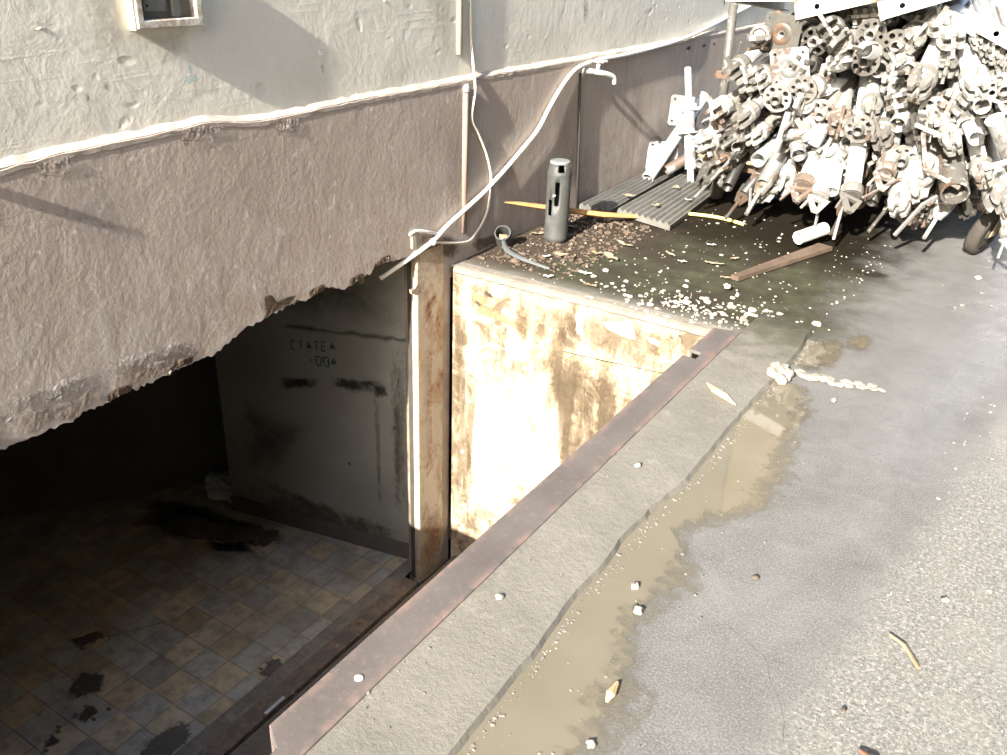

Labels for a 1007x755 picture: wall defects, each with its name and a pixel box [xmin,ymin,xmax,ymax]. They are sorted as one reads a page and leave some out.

leakage [473,295,527,339]
flaking render [3,370,93,433]
flaking render [107,341,193,402]
leakage [336,378,387,397]
leakage [456,326,474,509]
leakage [487,312,678,495]